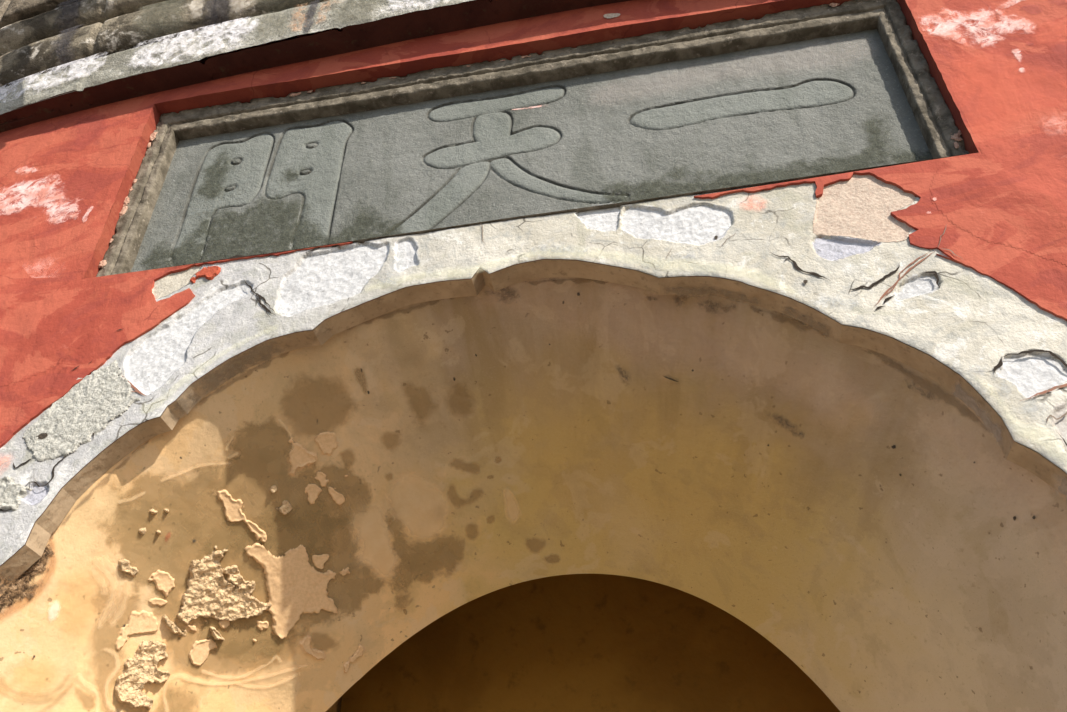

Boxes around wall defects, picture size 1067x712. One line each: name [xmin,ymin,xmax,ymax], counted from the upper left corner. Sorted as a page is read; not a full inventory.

peeling [152,266,221,299]
crack [207,252,275,317]
spalling [275,239,419,317]
spalling [576,205,732,245]
peeling [813,174,915,261]
crack [770,224,960,310]
spalling [123,280,254,395]
crack [994,349,1067,446]
spalling [997,354,1067,398]
peeling [287,419,345,505]
damp [107,420,464,662]
peeling [114,485,350,710]